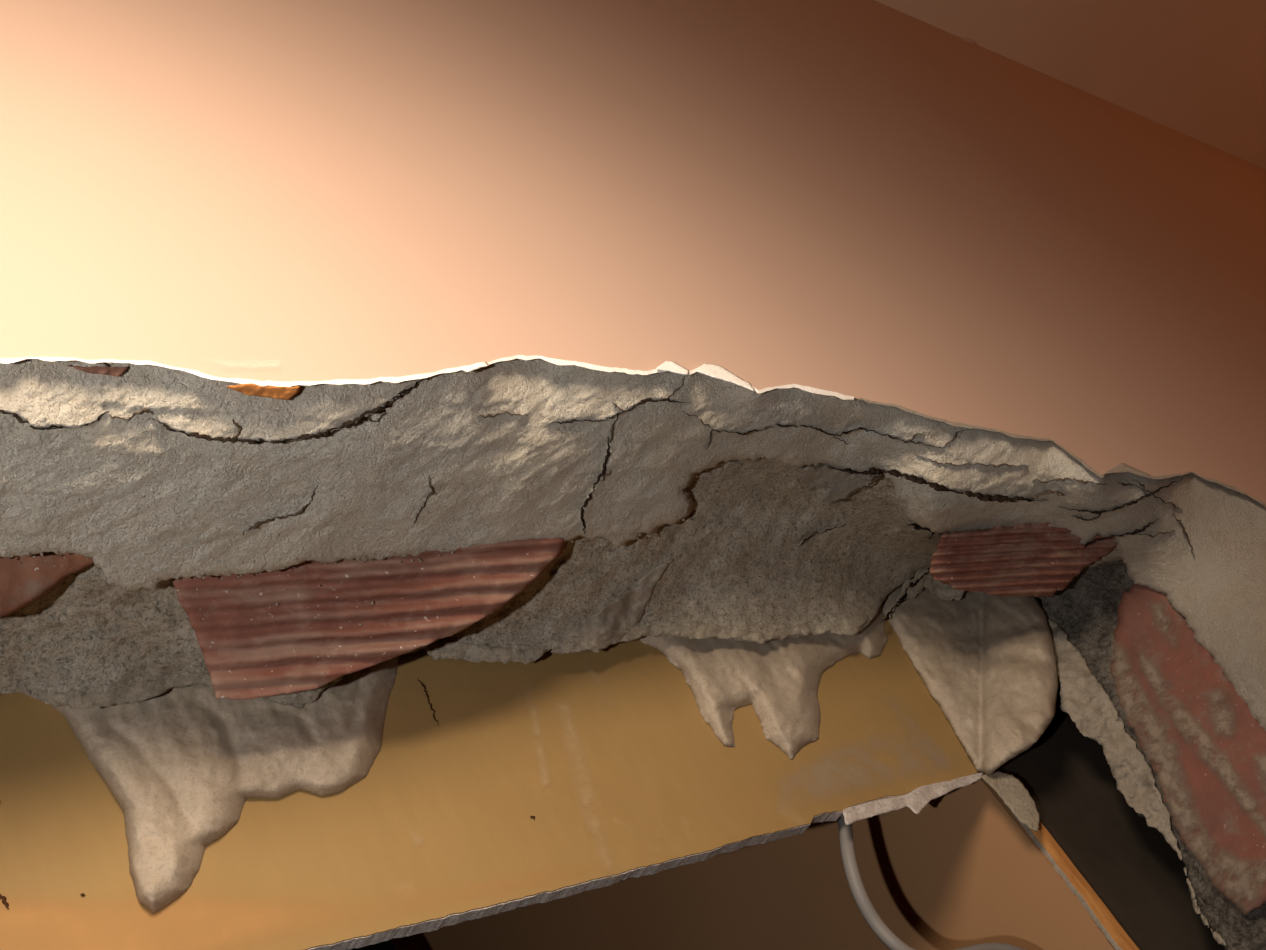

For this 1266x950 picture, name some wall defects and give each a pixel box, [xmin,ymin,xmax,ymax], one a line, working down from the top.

crack [0,377,429,444]
crack [477,376,1194,554]
crack [242,485,318,536]
crack [414,476,434,523]
flaking render [0,355,1266,950]